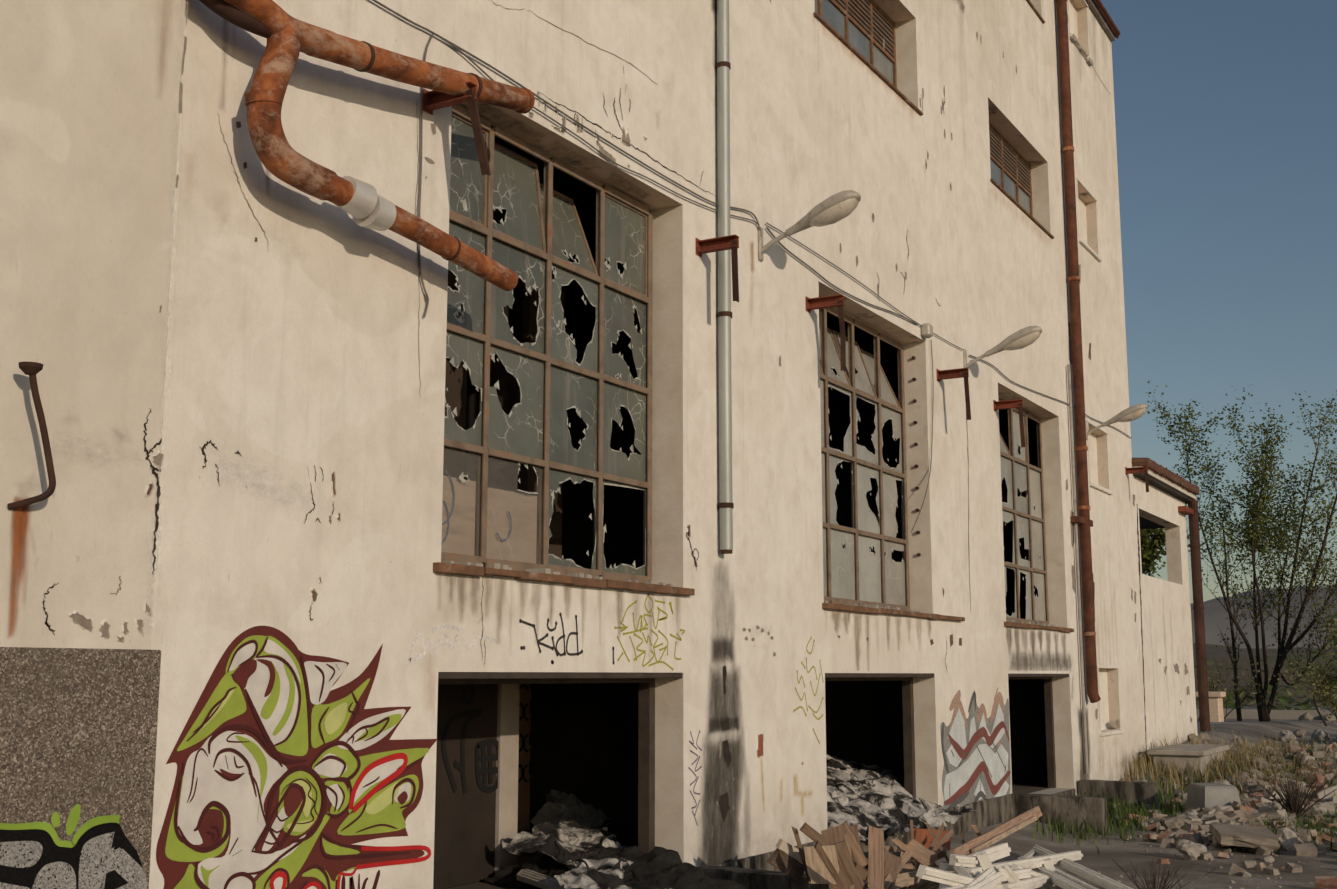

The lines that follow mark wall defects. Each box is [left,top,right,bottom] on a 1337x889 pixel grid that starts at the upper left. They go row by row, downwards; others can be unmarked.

crack [111,409,162,595]
corrosion [10,499,27,634]
crack [42,583,58,635]
peeling [68,601,151,643]
leakage [714,642,732,658]
leakage [834,612,868,669]
leakage [1007,628,1065,660]
leakage [703,673,741,866]